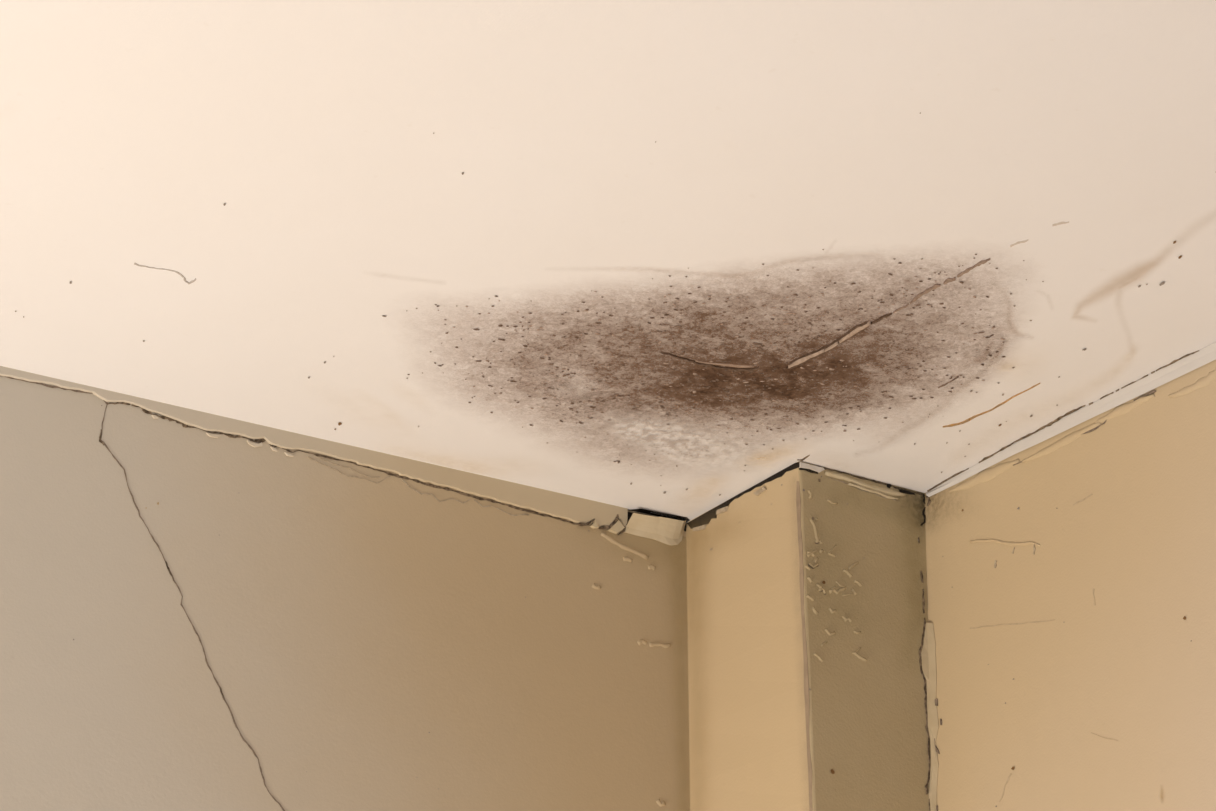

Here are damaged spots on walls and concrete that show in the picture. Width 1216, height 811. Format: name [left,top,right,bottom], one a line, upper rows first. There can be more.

leakage [465,254,1015,467]
crack [787,221,1069,369]
crack [3,376,589,811]
peeling [577,506,729,546]
crack [796,350,1199,811]